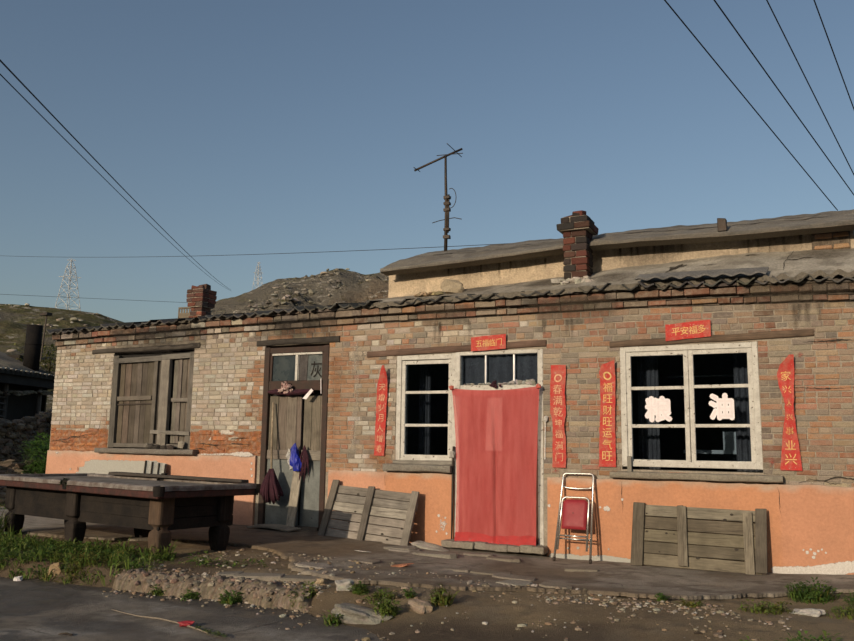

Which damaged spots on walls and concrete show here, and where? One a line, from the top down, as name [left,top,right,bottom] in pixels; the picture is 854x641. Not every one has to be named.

spalling [50,428,157,474]